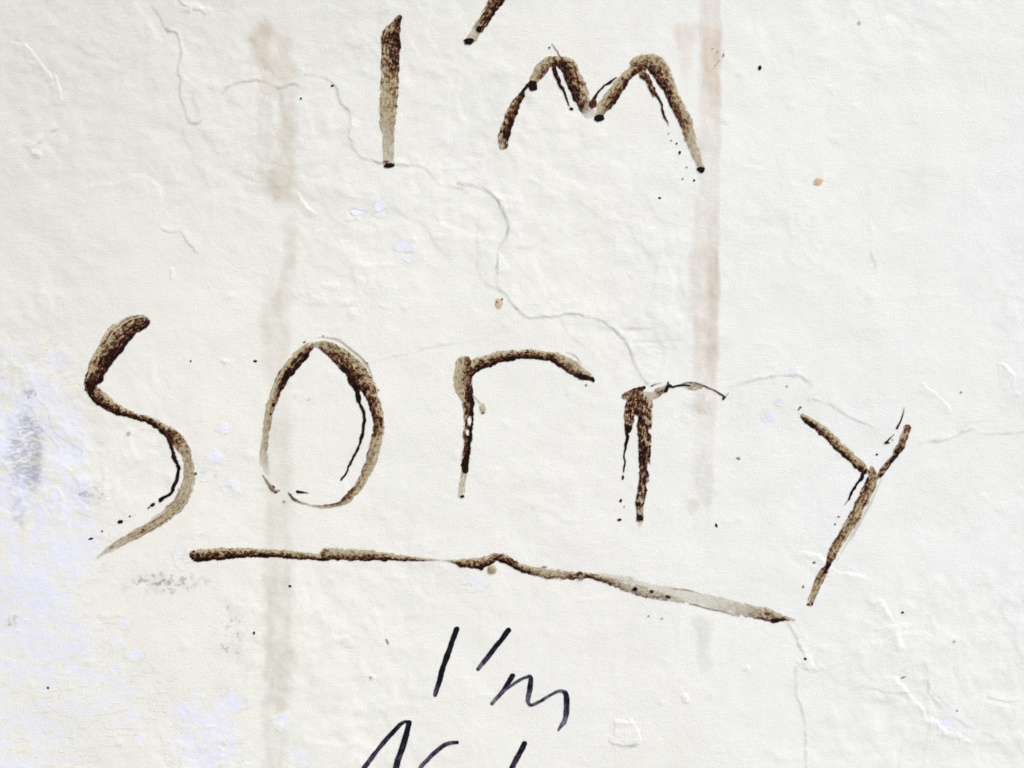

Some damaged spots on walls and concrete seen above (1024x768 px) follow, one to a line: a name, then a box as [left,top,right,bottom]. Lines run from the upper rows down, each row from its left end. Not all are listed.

crack [161,19,200,121]
crack [220,64,649,369]